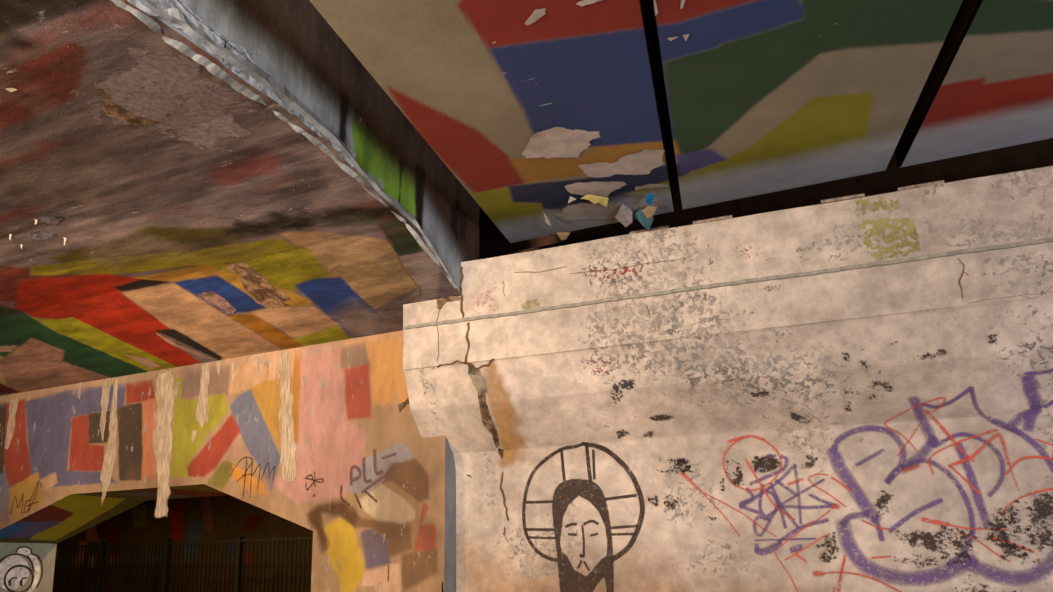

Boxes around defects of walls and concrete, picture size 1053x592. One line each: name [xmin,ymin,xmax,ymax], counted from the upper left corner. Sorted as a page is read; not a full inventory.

peeling [525,8,546,26]
peeling [70,0,461,309]
peeling [521,127,670,222]
spalling [197,291,237,314]